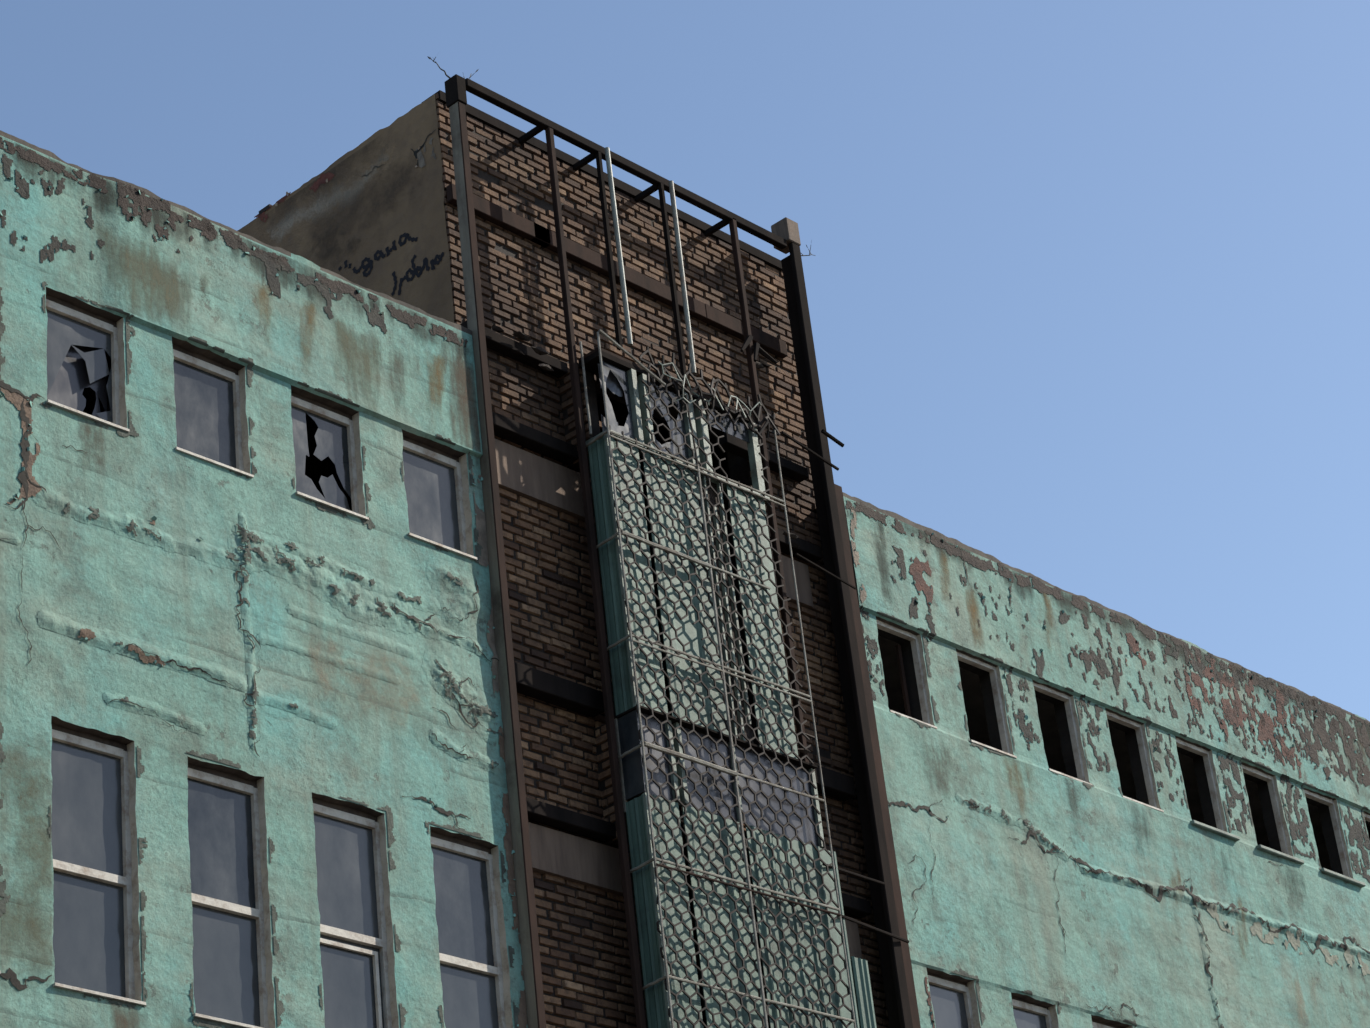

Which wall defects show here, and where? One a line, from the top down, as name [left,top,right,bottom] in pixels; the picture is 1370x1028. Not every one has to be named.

spalling [0,287,52,505]
crack [0,381,91,685]
spalling [93,410,139,438]
spalling [105,305,135,384]
crack [124,517,261,757]
spalling [188,336,254,387]
peeling [0,137,468,347]
spalling [230,417,257,479]
spalling [297,381,360,408]
crack [395,576,499,768]
peeling [846,500,1370,885]
crack [888,799,1370,1028]